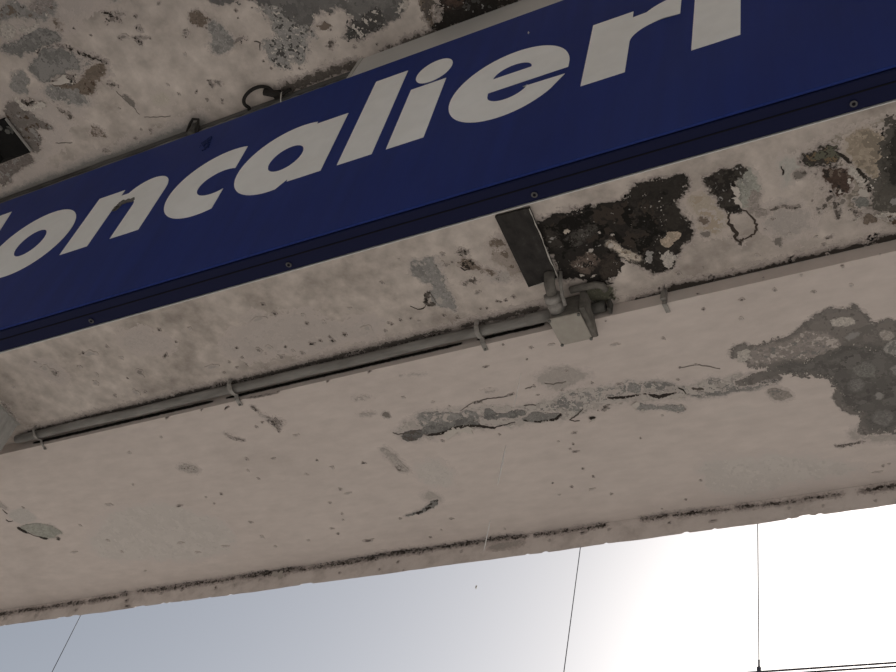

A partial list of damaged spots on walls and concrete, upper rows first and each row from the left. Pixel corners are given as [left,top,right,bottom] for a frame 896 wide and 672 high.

peeling [182,0,441,71]
water stain [427,0,504,31]
peeling [0,0,110,190]
water stain [0,76,98,193]
peeling [730,185,743,208]
peeling [838,166,896,227]
peeling [645,231,681,269]
crack [726,210,758,246]
peeling [390,302,896,444]
peeling [19,521,64,541]
water stain [82,496,245,568]